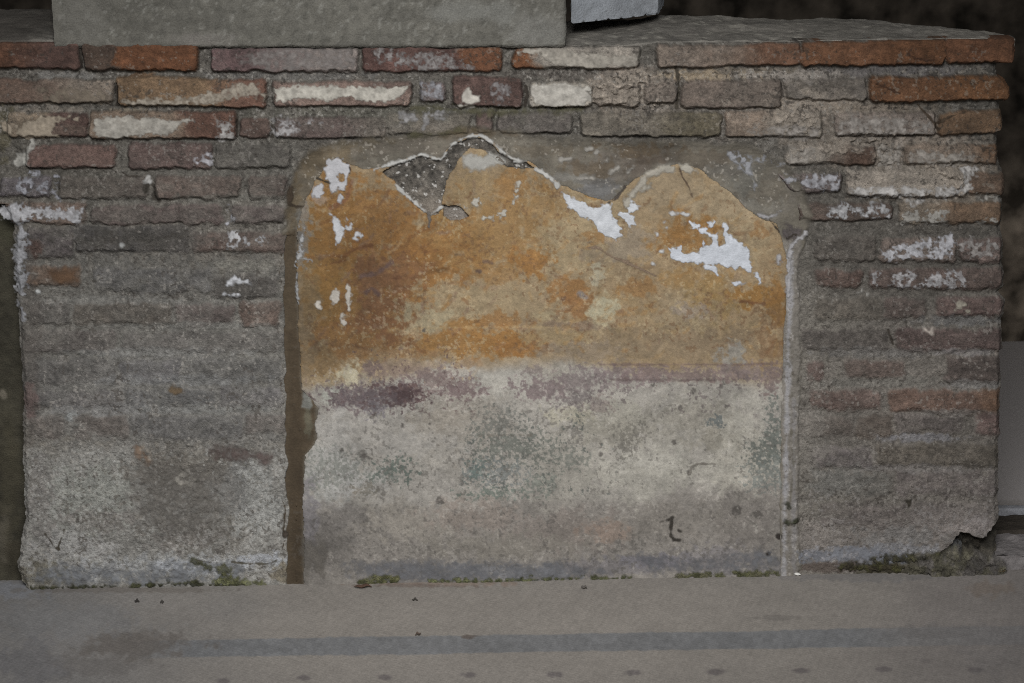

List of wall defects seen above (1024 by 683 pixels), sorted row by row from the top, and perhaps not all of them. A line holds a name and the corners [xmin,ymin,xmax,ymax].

efflorescence [0,138,84,322]
peeling [294,226,312,304]
peeling [311,158,350,203]
peeling [329,213,363,245]
spalling [383,137,534,221]
peeling [563,163,696,239]
efflorescence [784,173,840,192]
efflorescence [827,201,999,295]
peeling [315,284,351,326]